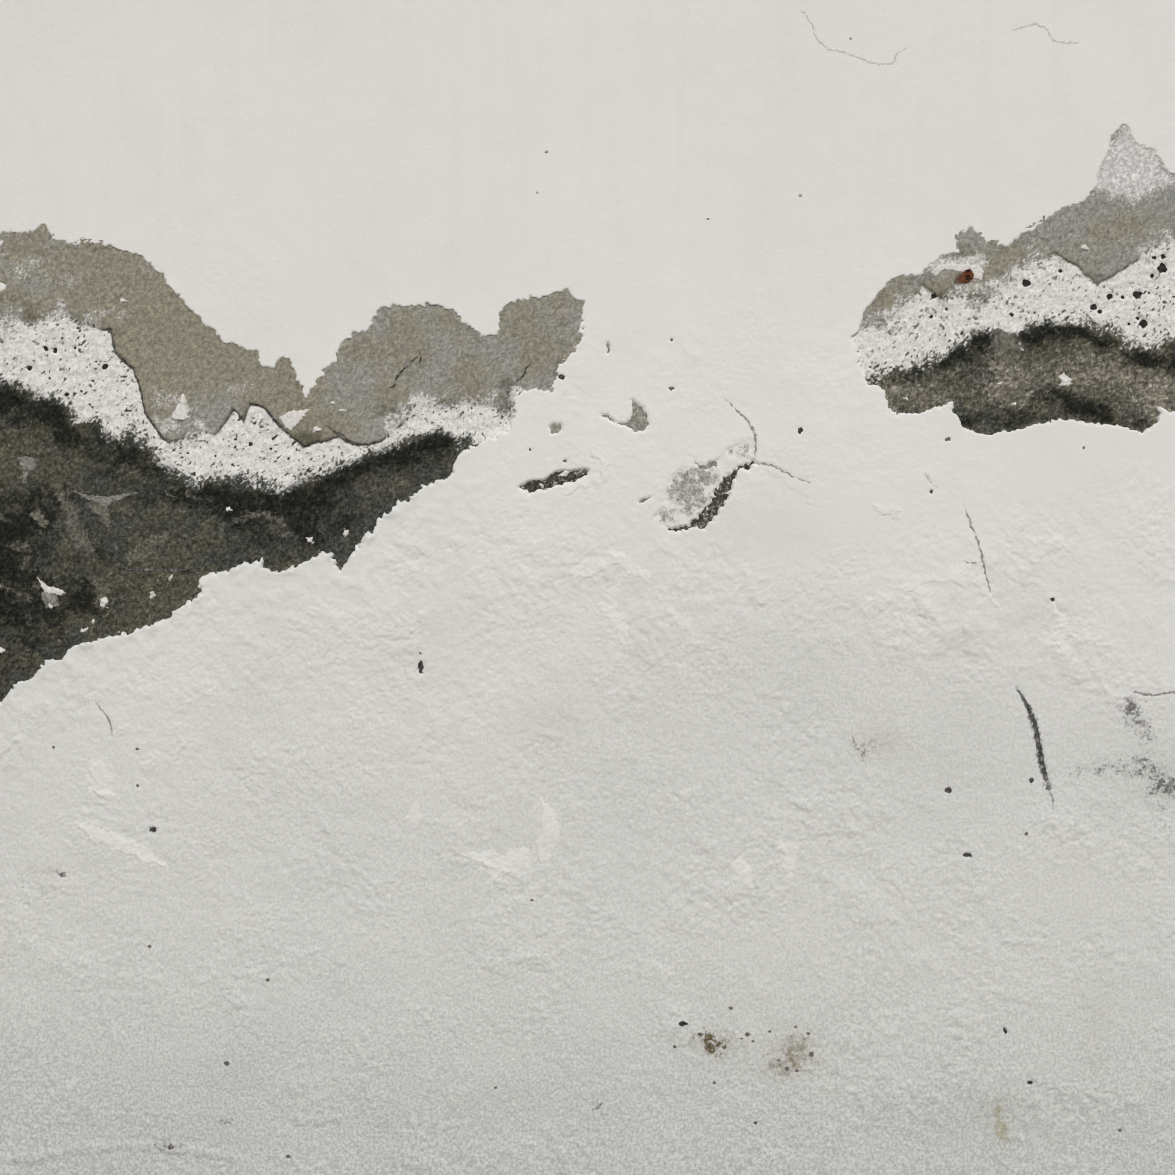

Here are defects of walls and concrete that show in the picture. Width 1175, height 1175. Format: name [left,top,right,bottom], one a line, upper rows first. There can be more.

rust [955,268,974,283]
peeling [852,125,1175,435]
peeling [0,224,588,702]
peeling [602,400,649,432]
flaking render [660,446,756,532]
crack [1017,690,1054,802]